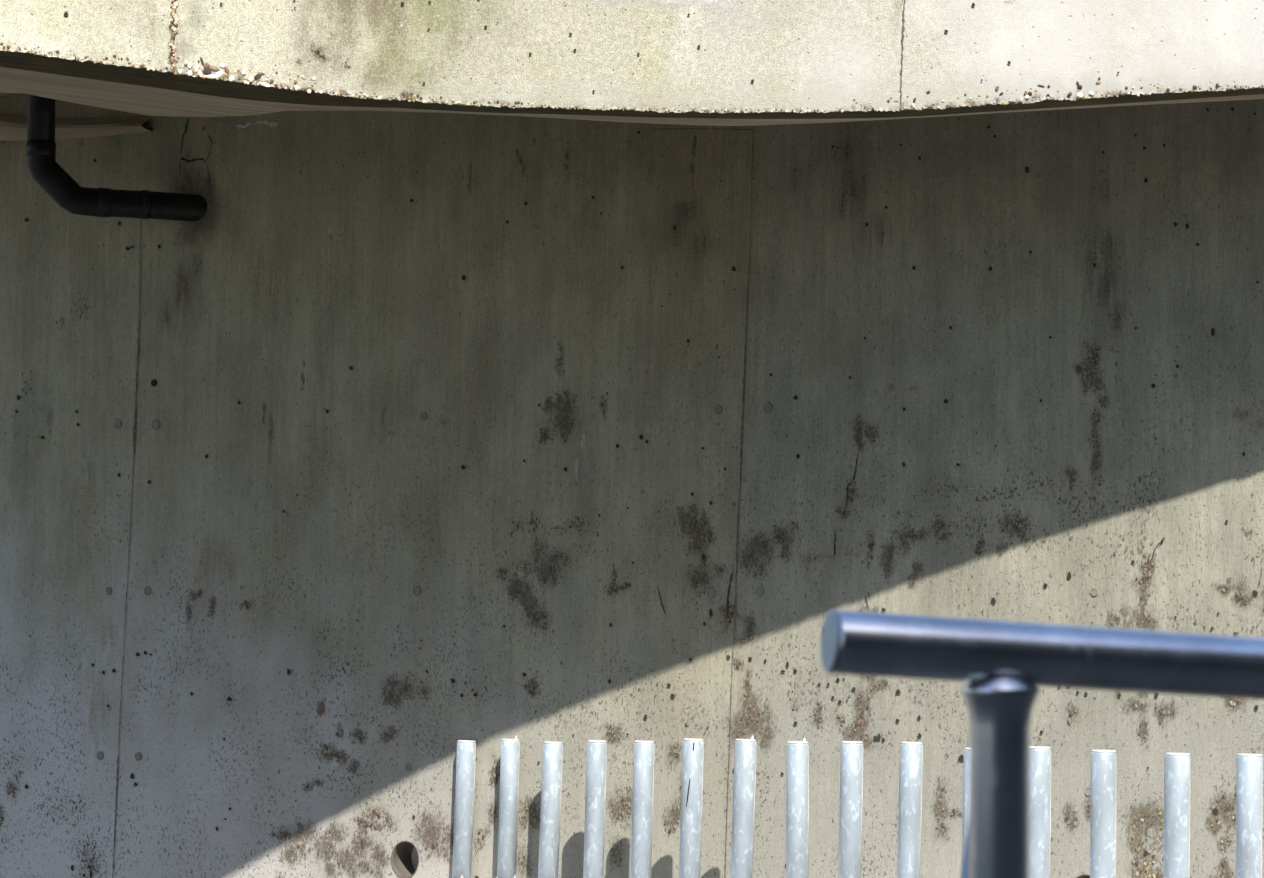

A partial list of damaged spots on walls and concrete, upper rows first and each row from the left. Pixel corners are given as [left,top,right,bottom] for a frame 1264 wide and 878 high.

spalling [0,42,1264,113]